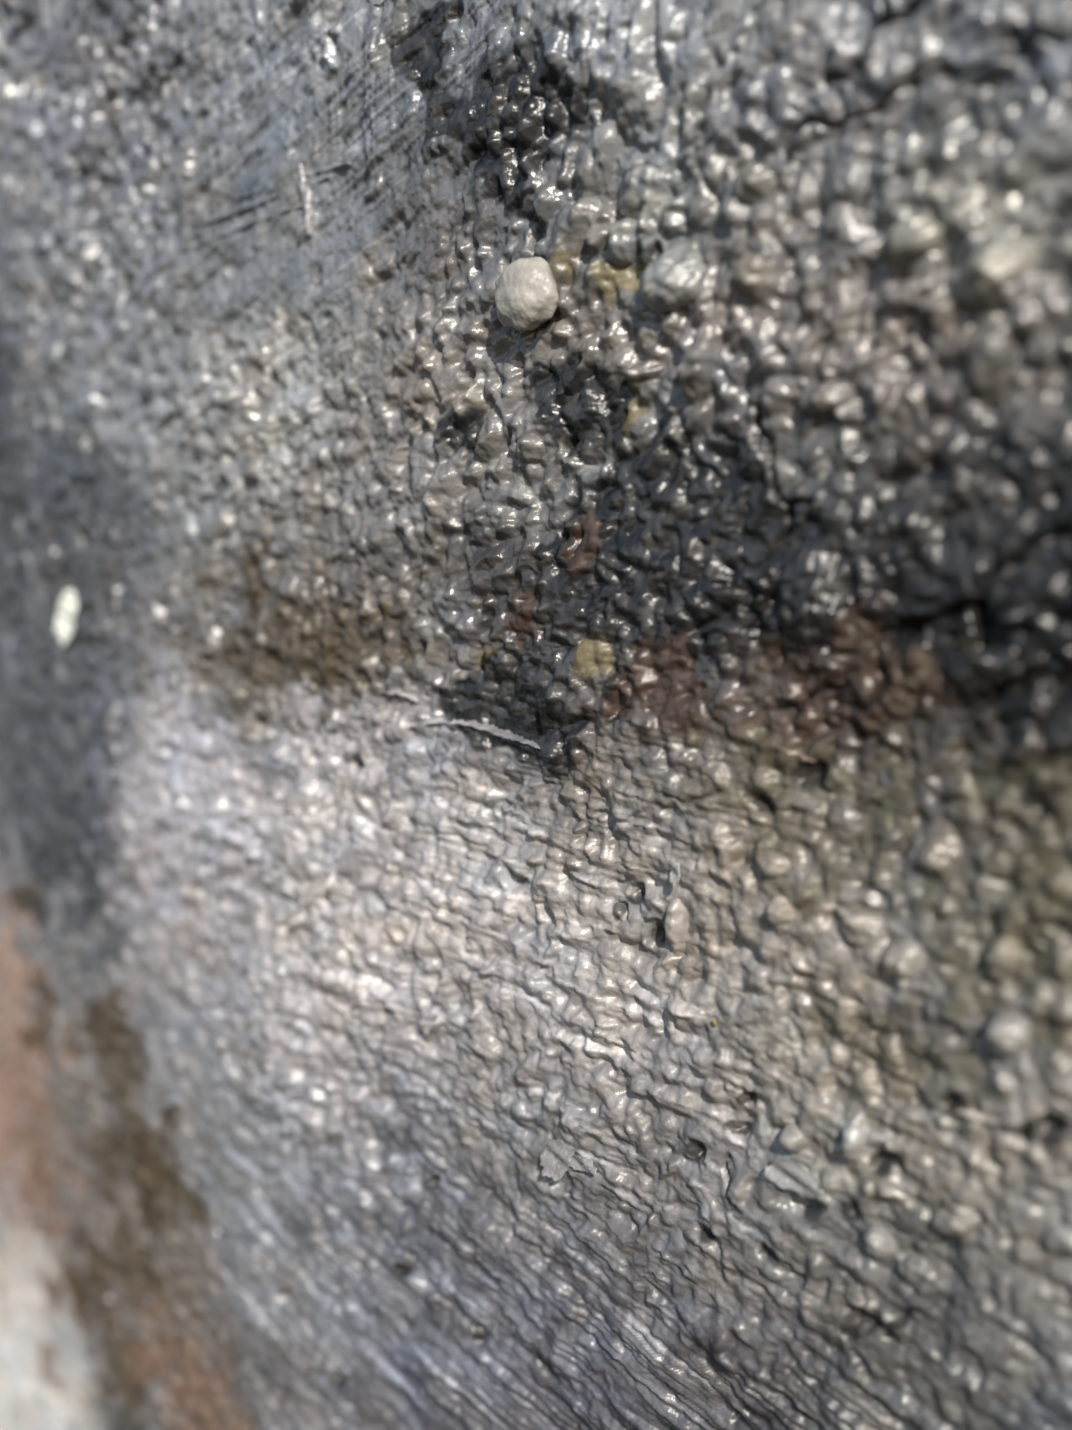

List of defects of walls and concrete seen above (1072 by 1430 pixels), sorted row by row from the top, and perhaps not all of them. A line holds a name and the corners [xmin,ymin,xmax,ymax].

corrosion [603,635,708,744]
corrosion [739,600,964,777]